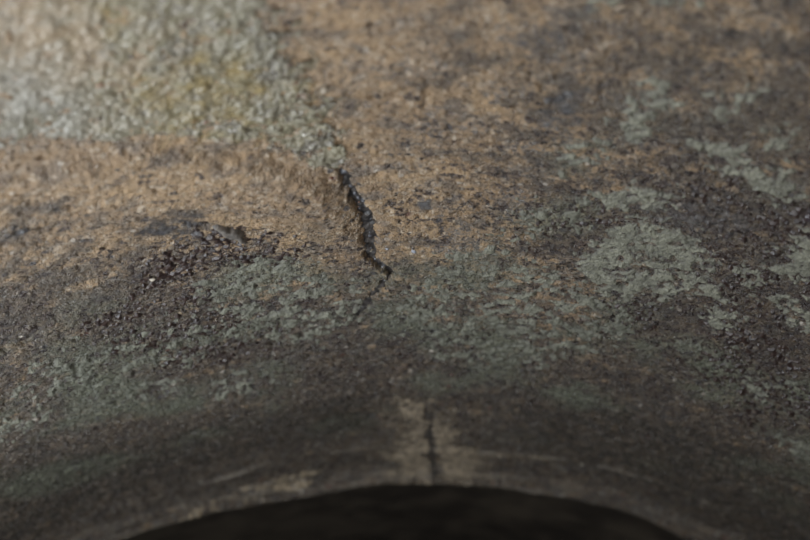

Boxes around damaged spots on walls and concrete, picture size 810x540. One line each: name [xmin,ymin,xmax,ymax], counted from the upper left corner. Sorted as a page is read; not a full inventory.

crack [339,167,392,316]
crack [420,400,439,480]